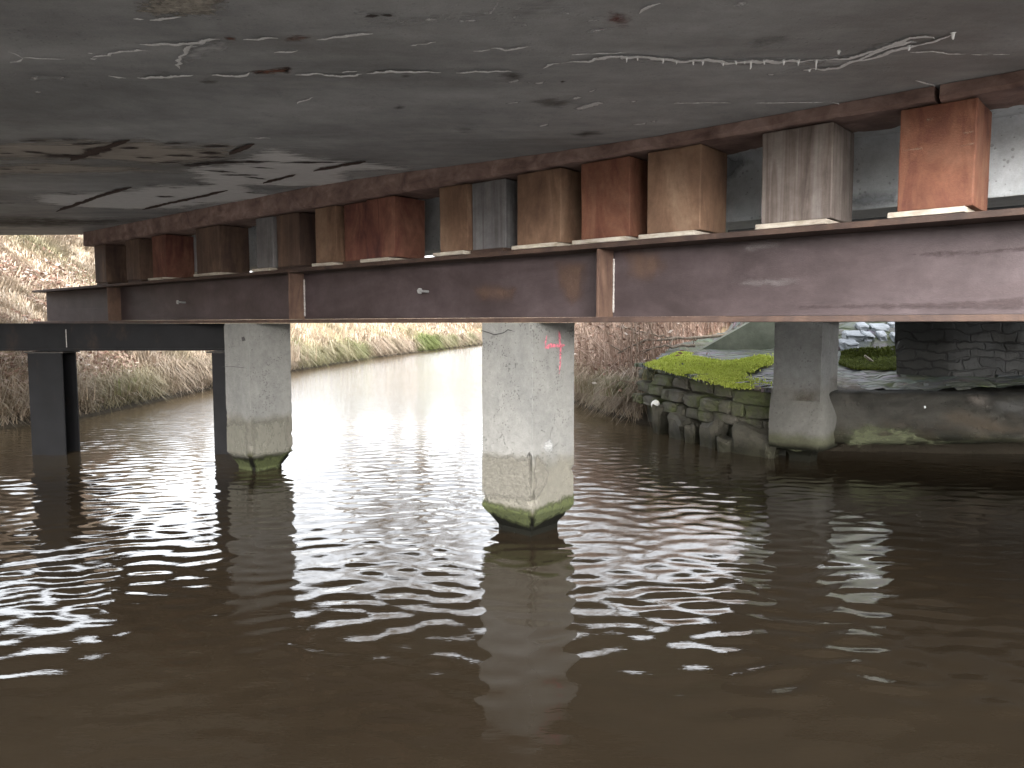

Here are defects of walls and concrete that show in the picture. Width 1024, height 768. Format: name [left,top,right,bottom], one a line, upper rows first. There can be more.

crack [89,17,528,104]
crack [544,32,1010,76]
damp [226,419,288,458]